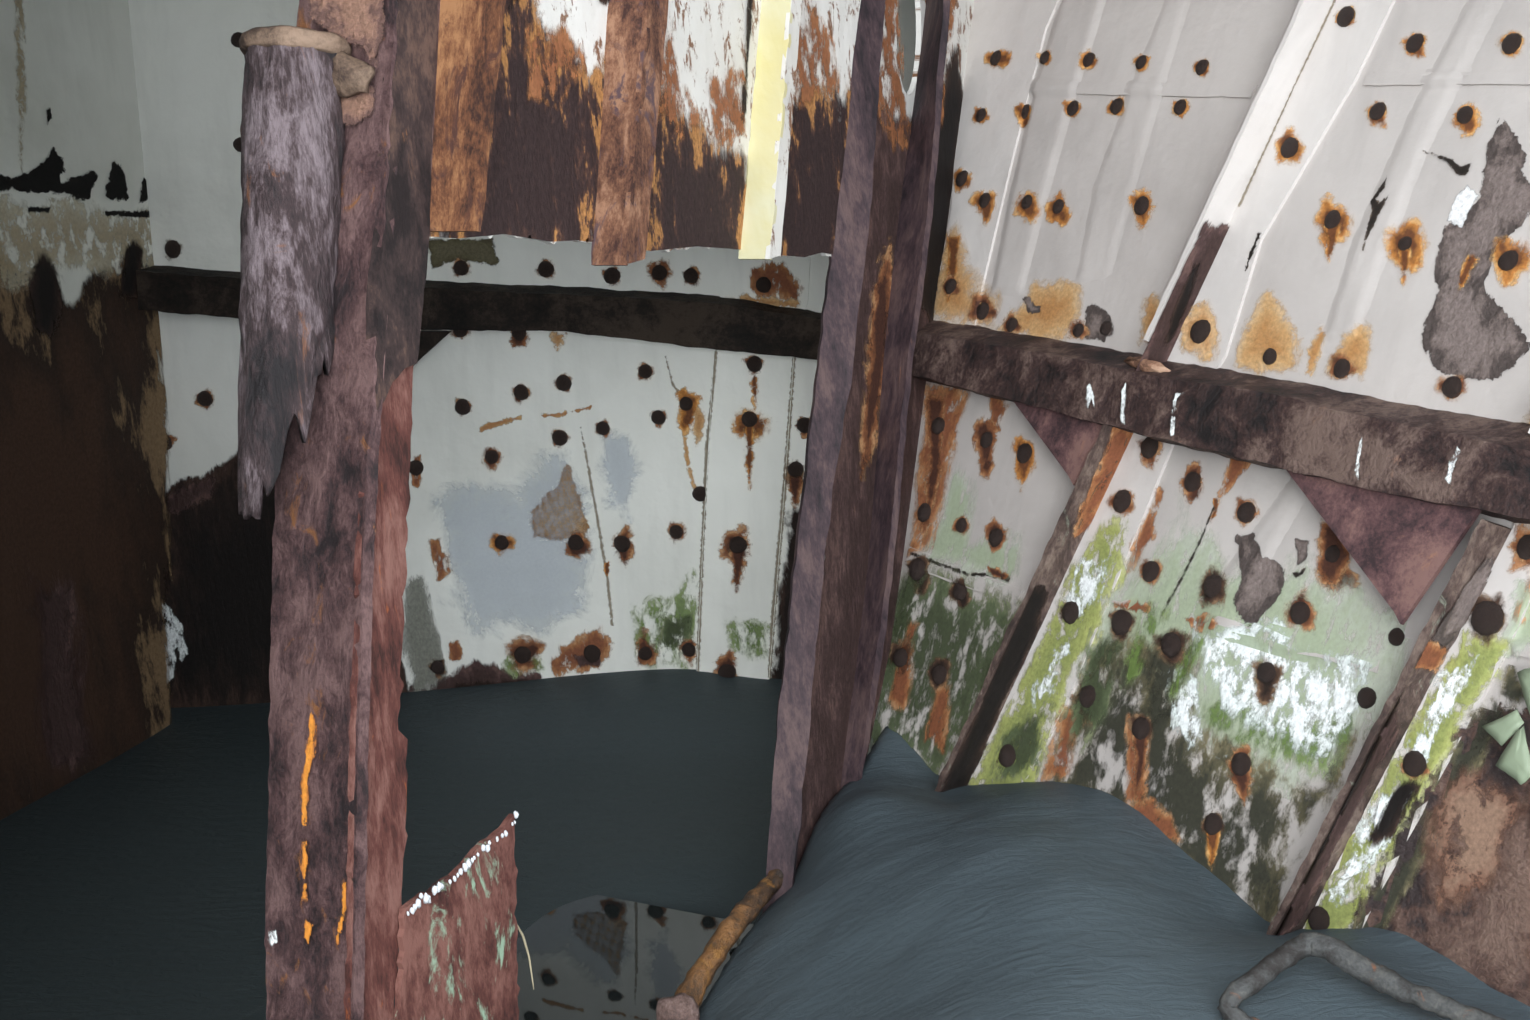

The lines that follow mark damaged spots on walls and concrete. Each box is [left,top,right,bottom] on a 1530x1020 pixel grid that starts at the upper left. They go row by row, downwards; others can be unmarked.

peeling [0,147,148,203]
damp [0,194,154,289]
rust [341,0,606,410]
peeling [530,465,590,541]
rust [740,1,851,308]
rust [796,0,912,870]
rust [866,376,1093,792]
rust [917,0,1090,340]
rust [1135,221,1229,372]
rust [1236,292,1372,379]
rust [1315,192,1350,262]
peeling [1422,120,1530,381]